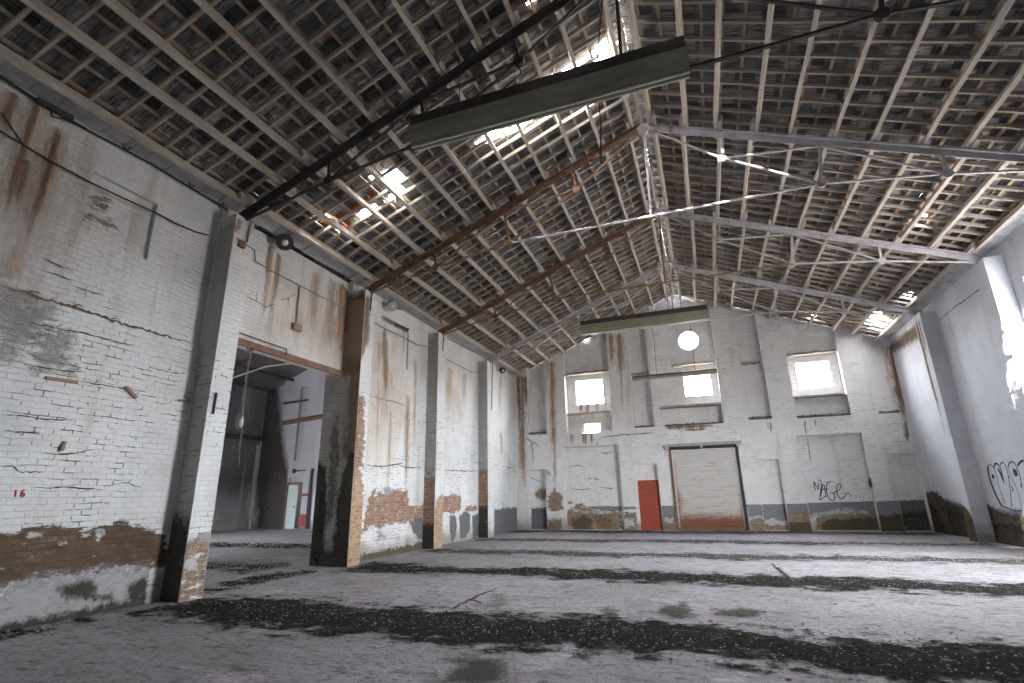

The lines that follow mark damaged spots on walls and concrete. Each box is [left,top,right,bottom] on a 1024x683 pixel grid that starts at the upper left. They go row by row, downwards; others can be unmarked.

rust [10,104,39,198]
rust [28,130,61,233]
crack [1,257,188,345]
flaking render [362,297,370,354]
crack [0,413,139,490]
flaking render [0,519,168,588]
flaking render [179,532,211,602]
flaking render [309,393,477,567]
rust [517,376,527,474]
flaking render [547,488,638,530]
water stain [945,500,979,542]